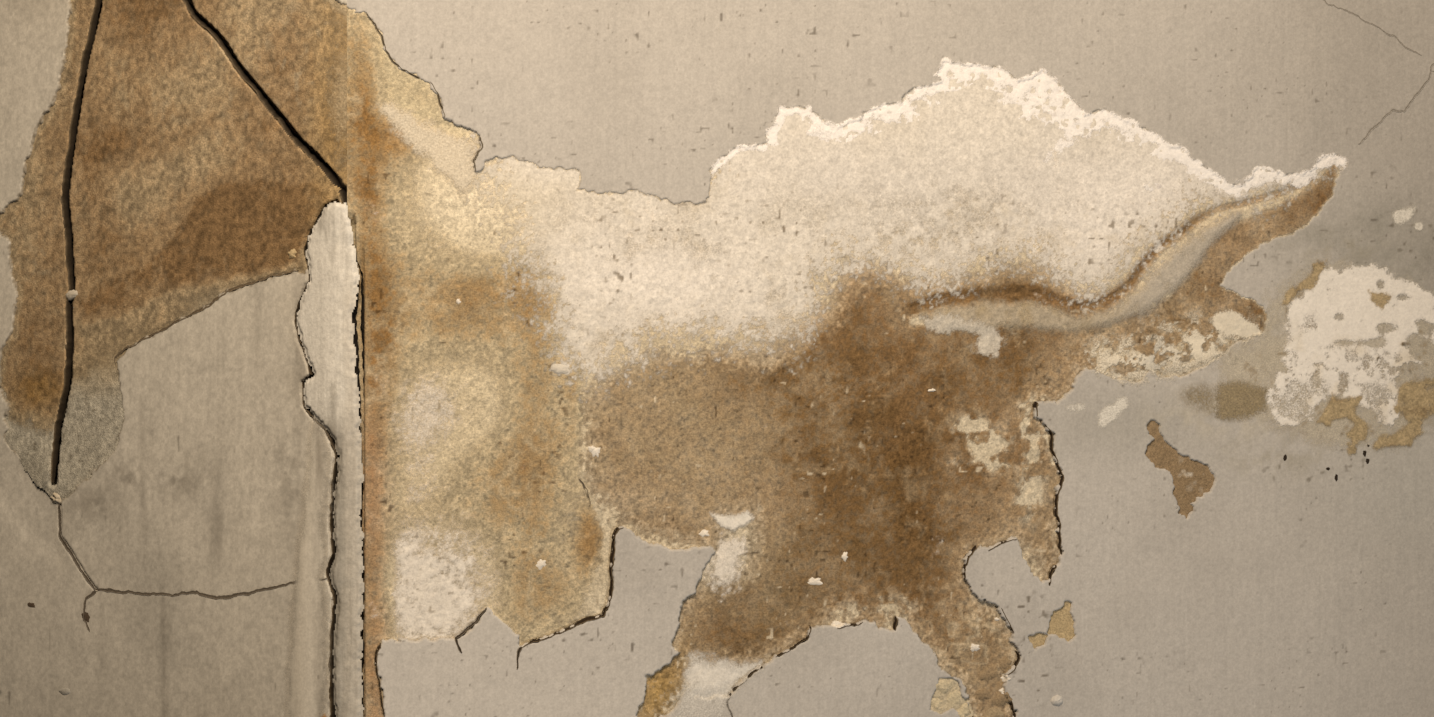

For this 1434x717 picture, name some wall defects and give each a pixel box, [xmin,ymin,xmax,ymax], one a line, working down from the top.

damp [0,0,95,430]
flaking render [0,2,384,717]
damp [69,0,347,378]
flaking render [322,0,739,288]
damp [340,9,1347,717]
flaking render [380,155,1434,717]
crack [1324,0,1434,144]